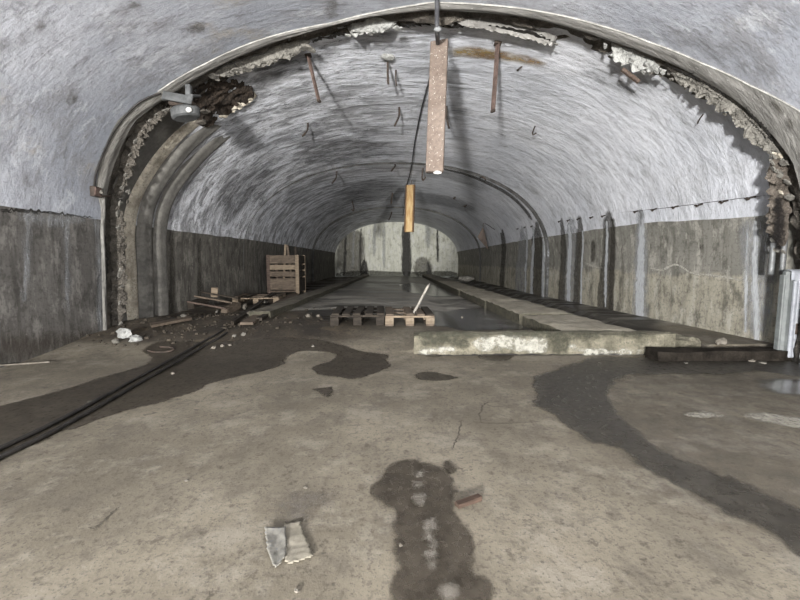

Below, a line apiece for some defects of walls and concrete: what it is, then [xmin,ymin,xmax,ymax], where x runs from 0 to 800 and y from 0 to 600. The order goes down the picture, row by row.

spalling [192,40,316,127]
peeling [345,17,403,38]
corrosion [455,48,541,64]
spalling [449,18,558,47]
spalling [603,43,796,254]
spalling [109,102,172,344]
water stain [558,211,615,310]
water stain [634,210,774,340]
water stain [0,337,390,454]
crack [453,401,539,448]
water stain [533,349,800,556]
water stain [370,460,493,600]